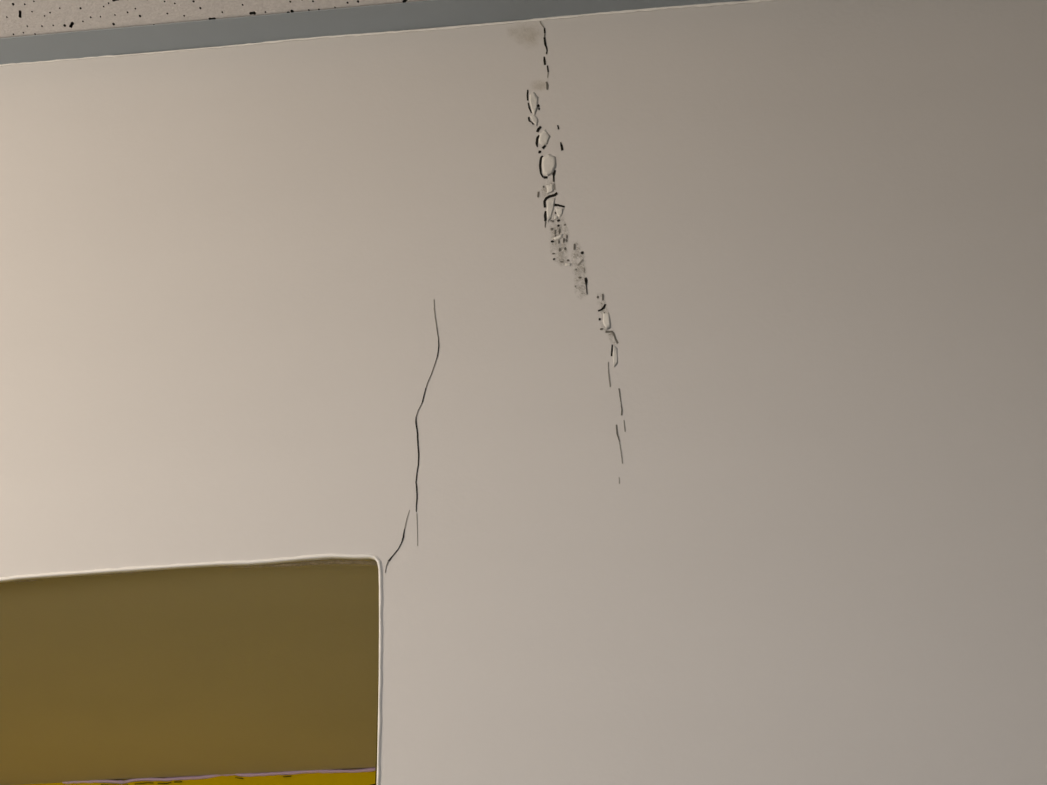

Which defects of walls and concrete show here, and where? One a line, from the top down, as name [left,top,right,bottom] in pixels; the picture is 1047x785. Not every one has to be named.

crack [527,21,565,228]
crack [385,304,439,573]
crack [573,244,626,484]